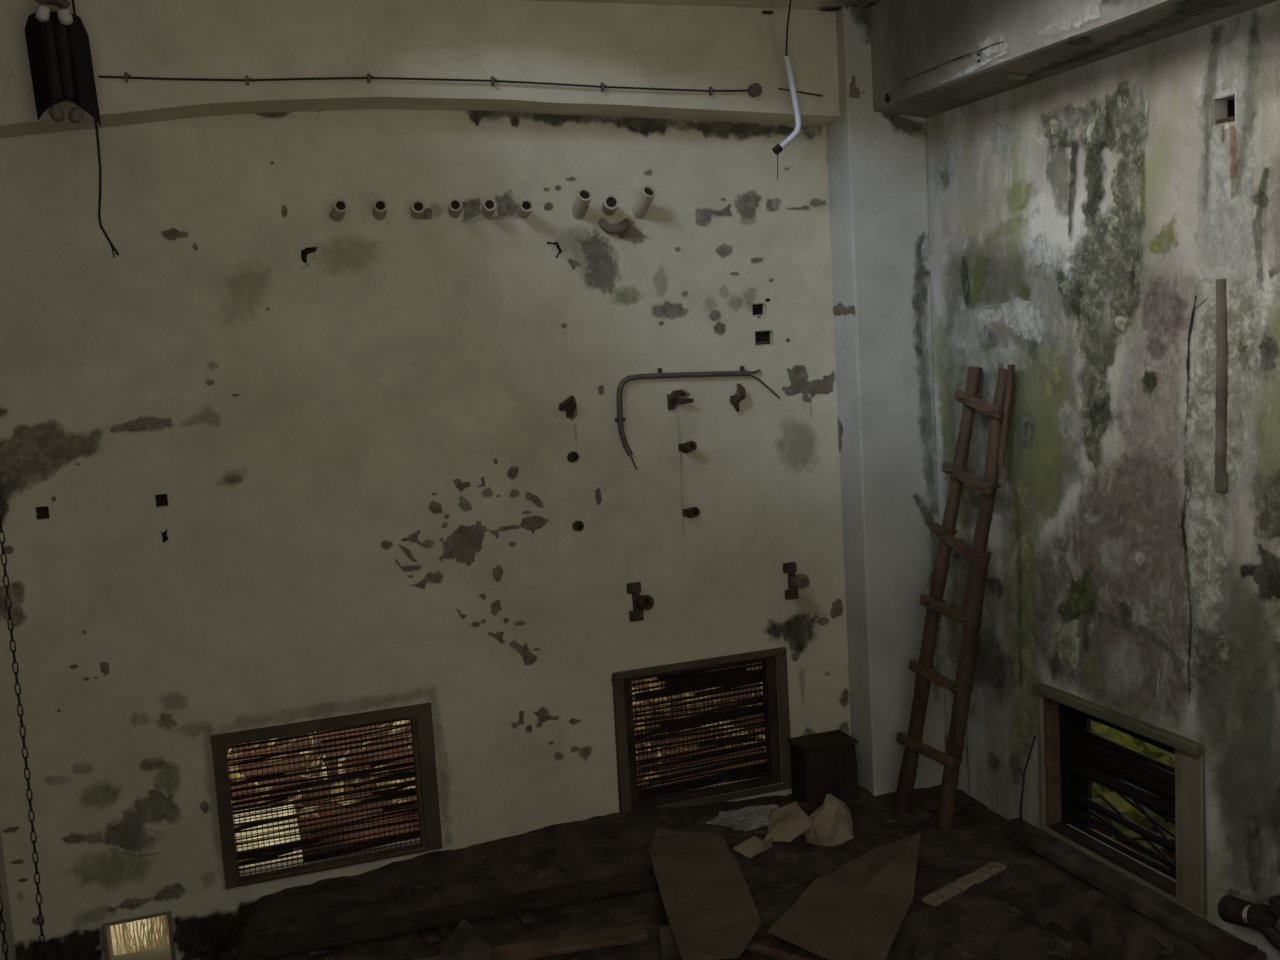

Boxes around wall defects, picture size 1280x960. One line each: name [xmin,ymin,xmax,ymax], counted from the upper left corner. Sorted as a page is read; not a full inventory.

leakage [941,34,1009,83]
leakage [467,111,821,139]
leakage [1008,0,1269,287]
peeling [547,222,646,304]
peeling [782,365,835,402]
leakage [1249,311,1280,540]
spalling [34,506,50,521]
peeling [381,459,549,589]
leakage [913,234,1079,792]
crack [1180,291,1213,702]
peeling [456,594,540,665]
leakage [1032,455,1280,901]